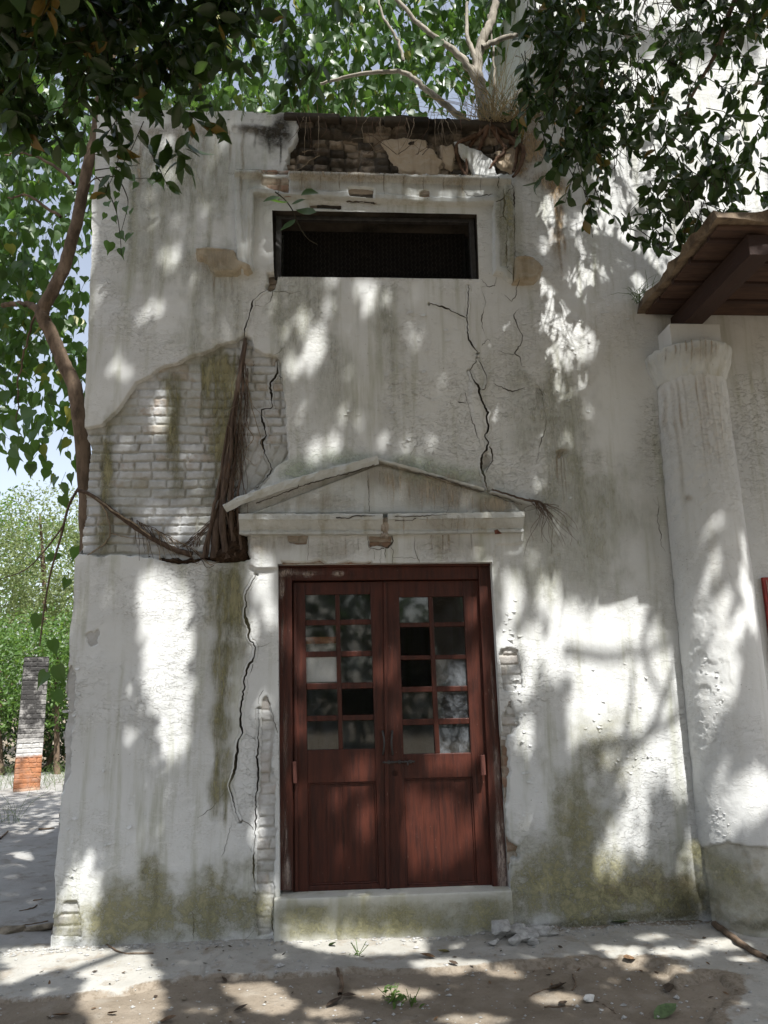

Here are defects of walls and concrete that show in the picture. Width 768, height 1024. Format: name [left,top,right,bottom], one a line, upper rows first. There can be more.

leakage [241,116,291,159]
flaking render [260,112,524,198]
flaking render [82,338,288,560]
crack [238,177,547,565]
crack [203,575,278,935]